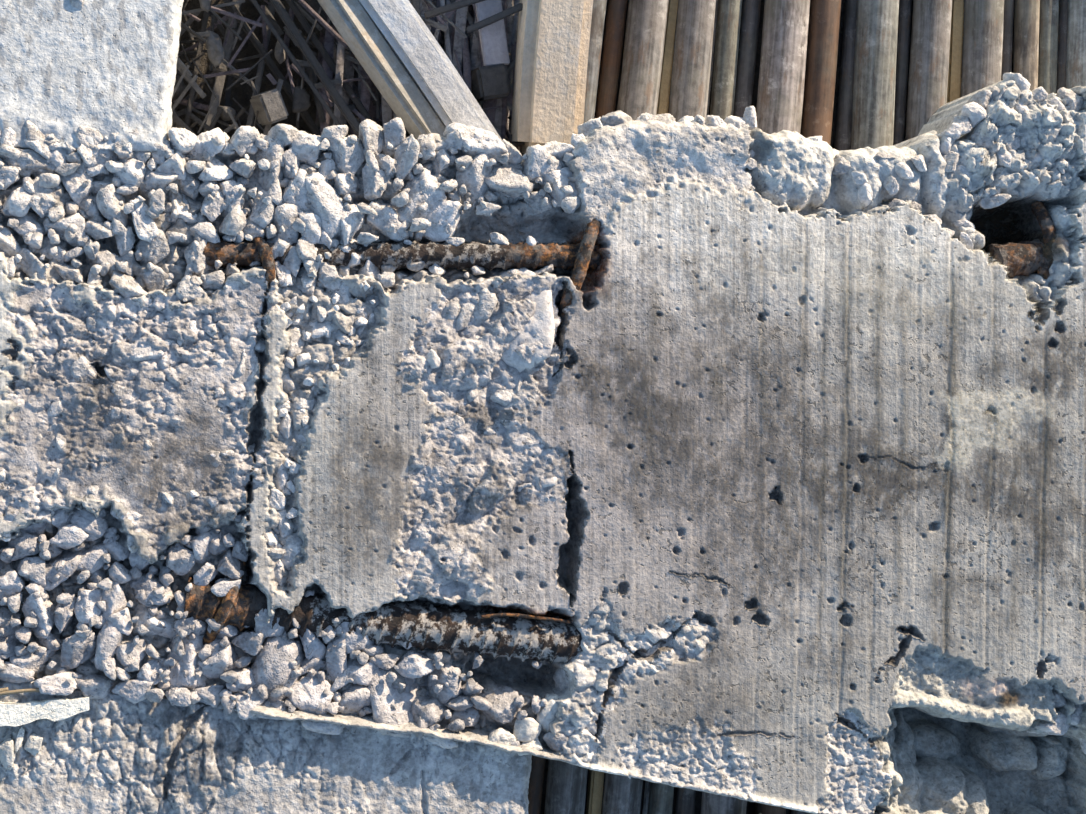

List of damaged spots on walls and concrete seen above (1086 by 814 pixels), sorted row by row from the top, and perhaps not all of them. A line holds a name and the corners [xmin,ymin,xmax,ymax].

corrosion [571,230,609,288]
spalling [571,72,1086,308]
corrosion [970,201,1063,260]
crack [244,281,271,584]
spalling [0,117,717,769]
corrosion [487,606,570,618]
crack [556,450,590,620]
crack [594,611,716,742]
spalling [816,648,1086,814]